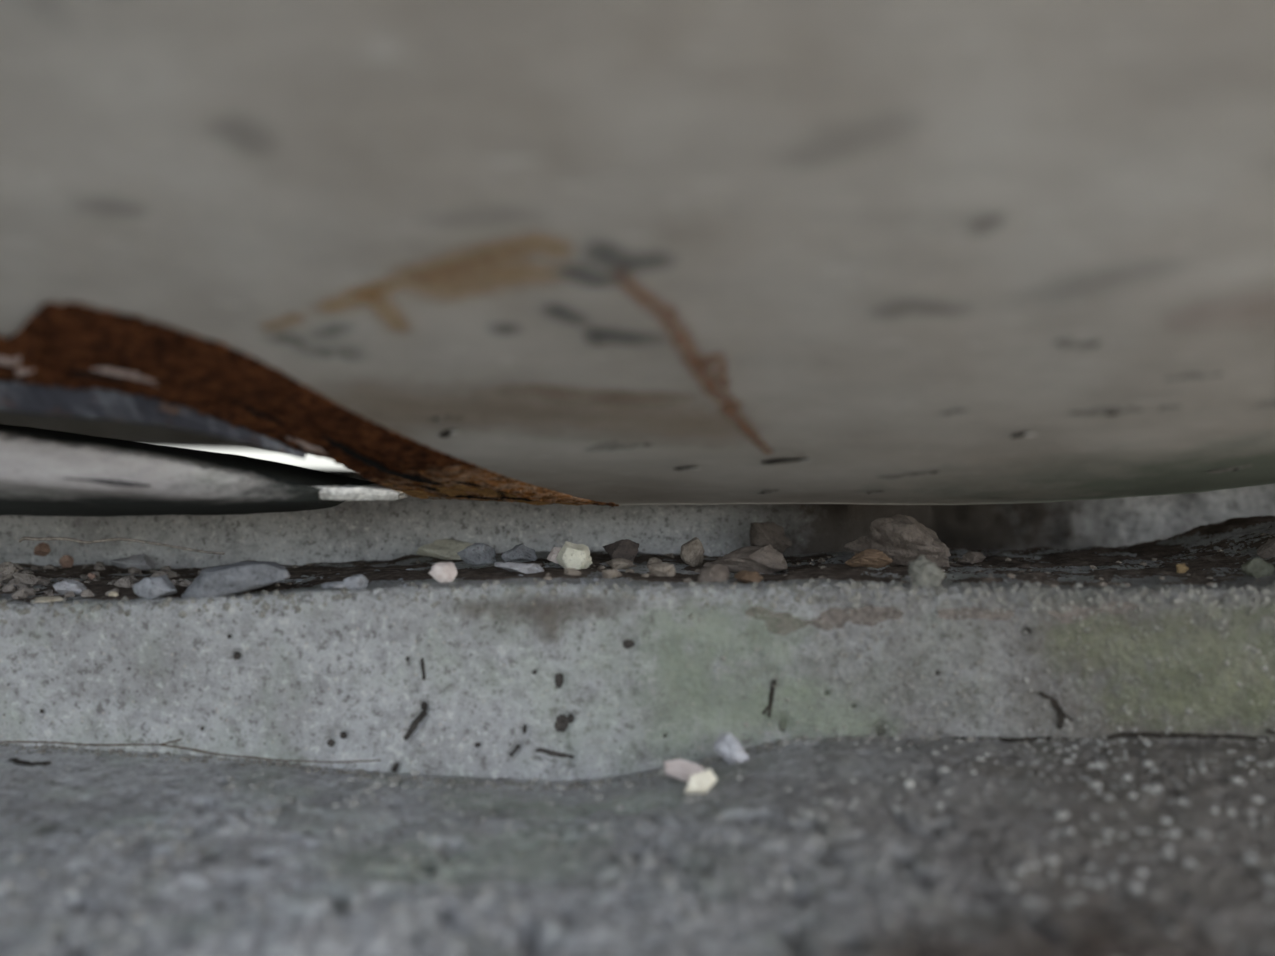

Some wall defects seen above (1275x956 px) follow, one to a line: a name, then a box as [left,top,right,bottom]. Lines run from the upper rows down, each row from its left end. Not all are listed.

corrosion [615,273,772,453]